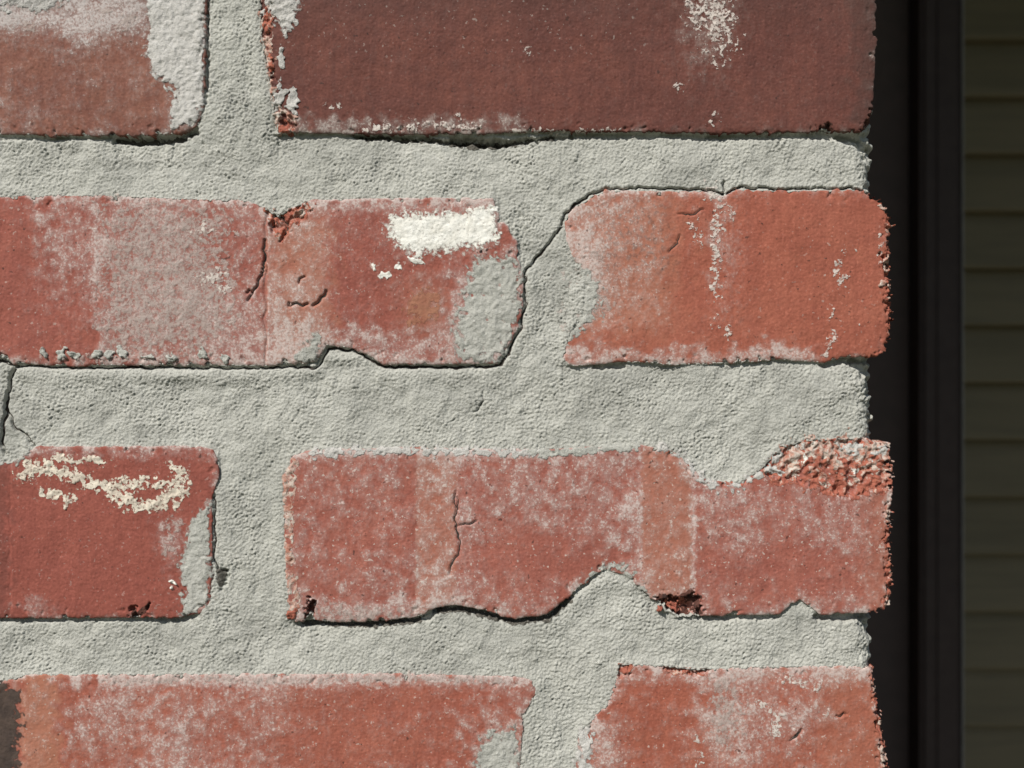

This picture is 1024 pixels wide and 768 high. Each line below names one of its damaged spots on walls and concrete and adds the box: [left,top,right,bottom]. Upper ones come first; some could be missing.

water stain [680,0,746,69]
spalling [263,201,316,242]
crack [0,183,866,454]
water stain [12,452,192,514]
crack [449,493,476,575]
spalling [725,427,895,610]
spalling [655,588,703,618]